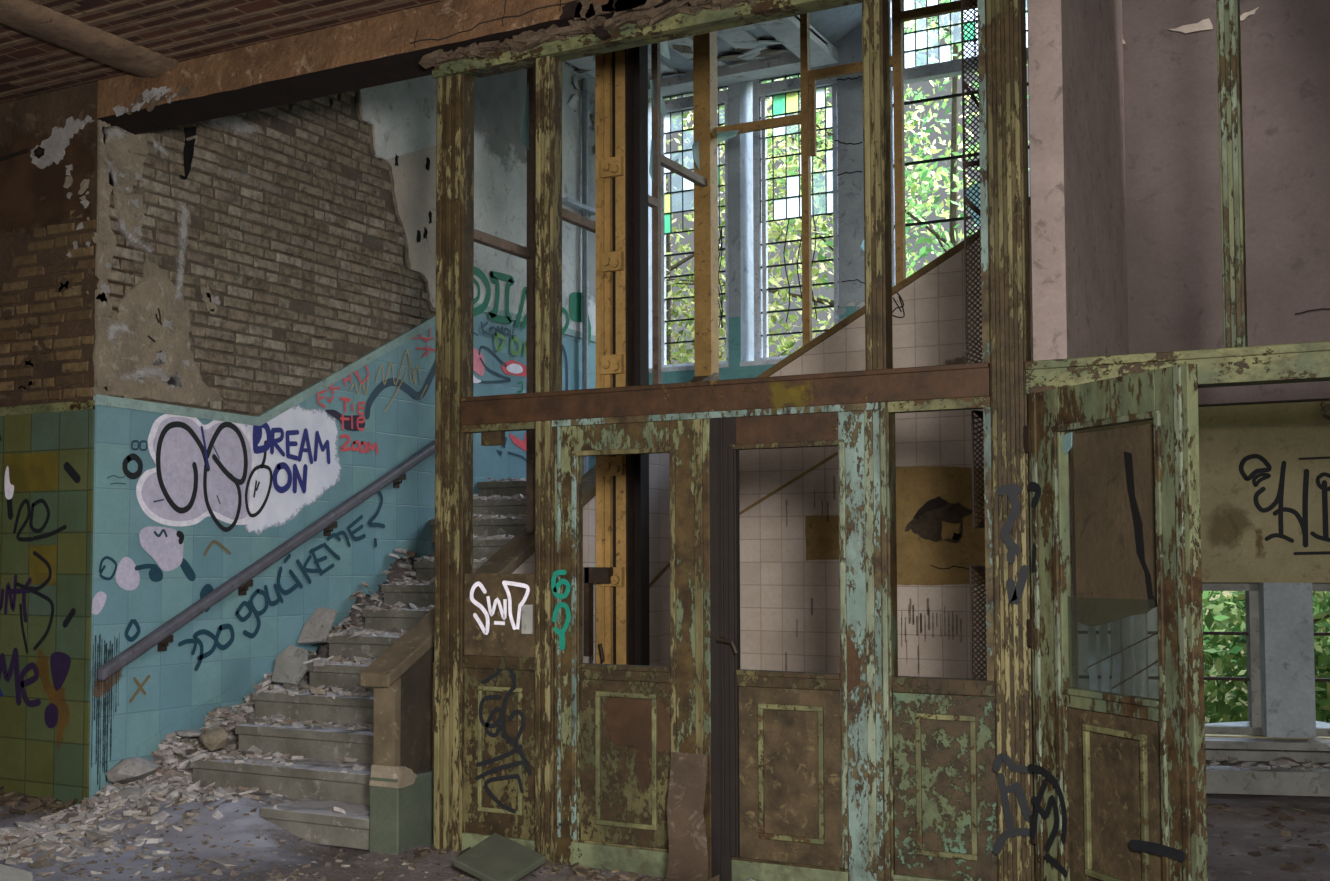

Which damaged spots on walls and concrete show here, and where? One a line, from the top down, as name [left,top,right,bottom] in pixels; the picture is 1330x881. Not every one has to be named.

peeling [717,24,791,67]
spalling [0,0,758,414]
corrosion [606,697,670,792]